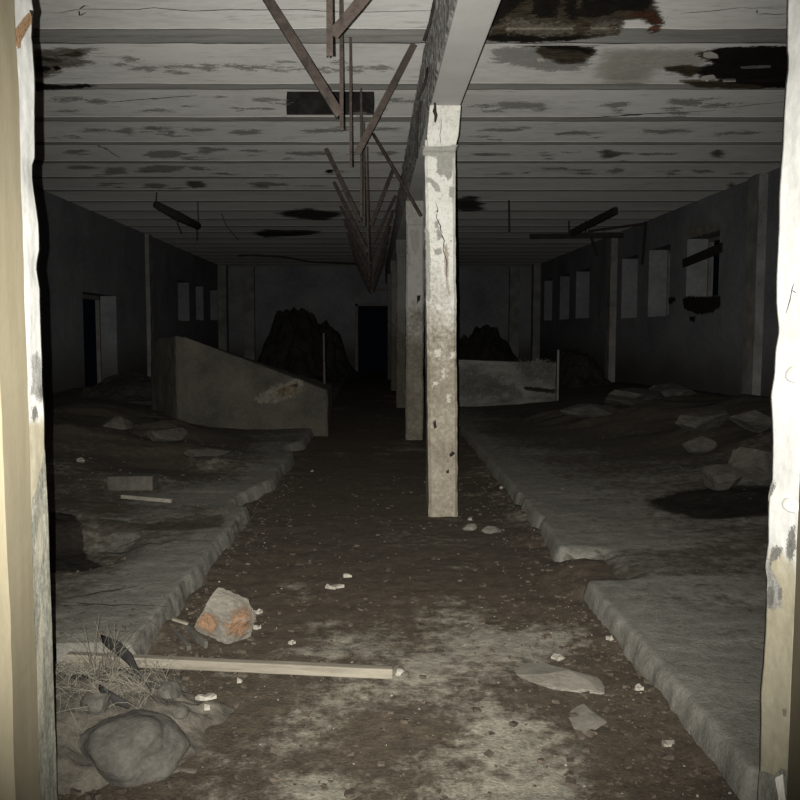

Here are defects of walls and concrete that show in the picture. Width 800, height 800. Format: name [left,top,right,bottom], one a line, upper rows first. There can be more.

damp [486,0,664,43]
damp [34,47,96,91]
damp [278,208,342,221]
crack [435,202,447,276]
spalling [682,296,721,322]
spalling [254,379,305,404]